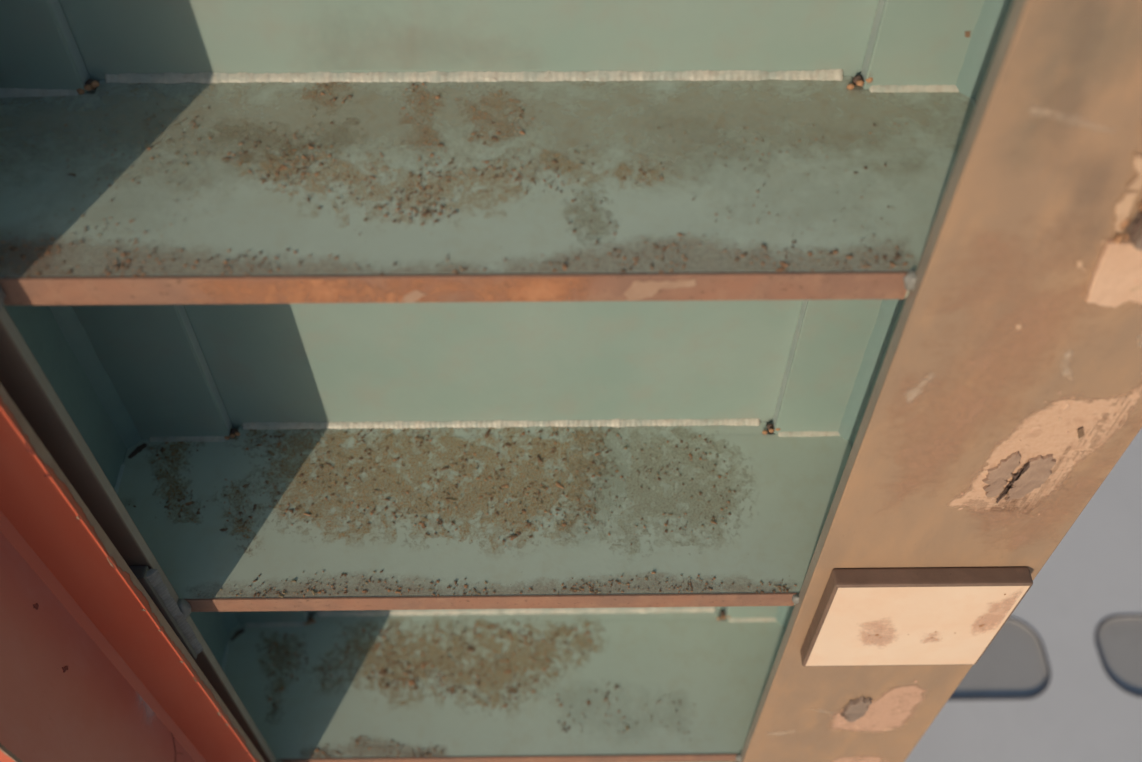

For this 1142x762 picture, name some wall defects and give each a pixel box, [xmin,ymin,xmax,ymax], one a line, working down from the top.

corrosion [847,75,873,90]
corrosion [0,232,424,304]
corrosion [225,82,709,302]
peeling [1082,150,1142,308]
corrosion [147,426,747,554]
peeling [948,384,1142,515]
corrosion [220,570,533,598]
corrosion [553,571,797,595]
corrosion [314,619,695,733]
peeling [830,680,929,732]